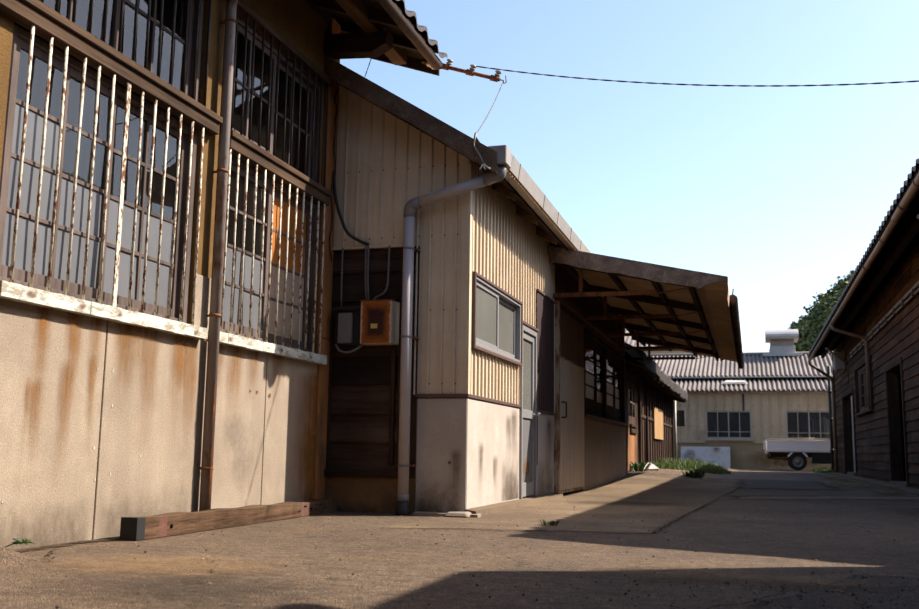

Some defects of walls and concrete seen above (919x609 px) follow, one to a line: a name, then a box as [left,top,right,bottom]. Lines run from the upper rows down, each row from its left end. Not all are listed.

rust [40,307,48,343]
rust [71,304,86,352]
rust [119,313,142,357]